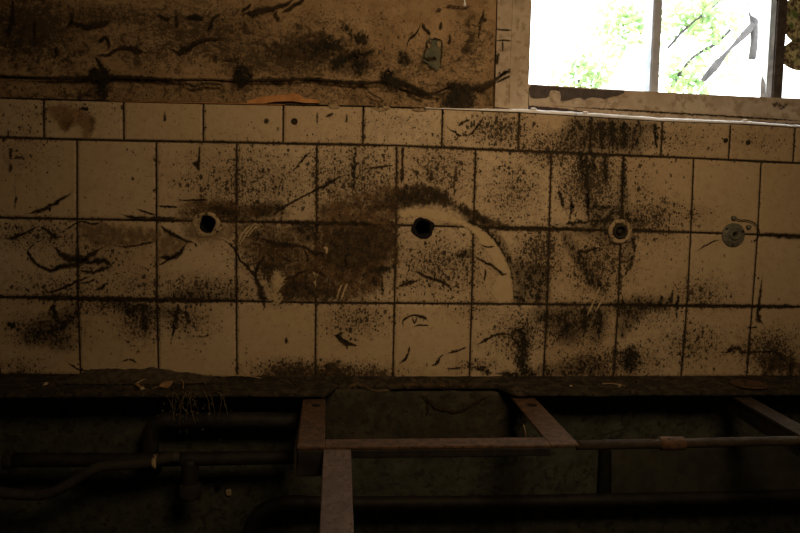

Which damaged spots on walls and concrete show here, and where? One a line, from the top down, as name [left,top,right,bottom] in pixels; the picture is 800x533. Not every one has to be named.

crack [12,5,511,102]
crack [3,193,207,293]
crack [222,238,326,310]
leakage [264,219,379,242]
leakage [366,116,660,377]
leakage [2,287,239,354]
leakage [614,290,799,376]